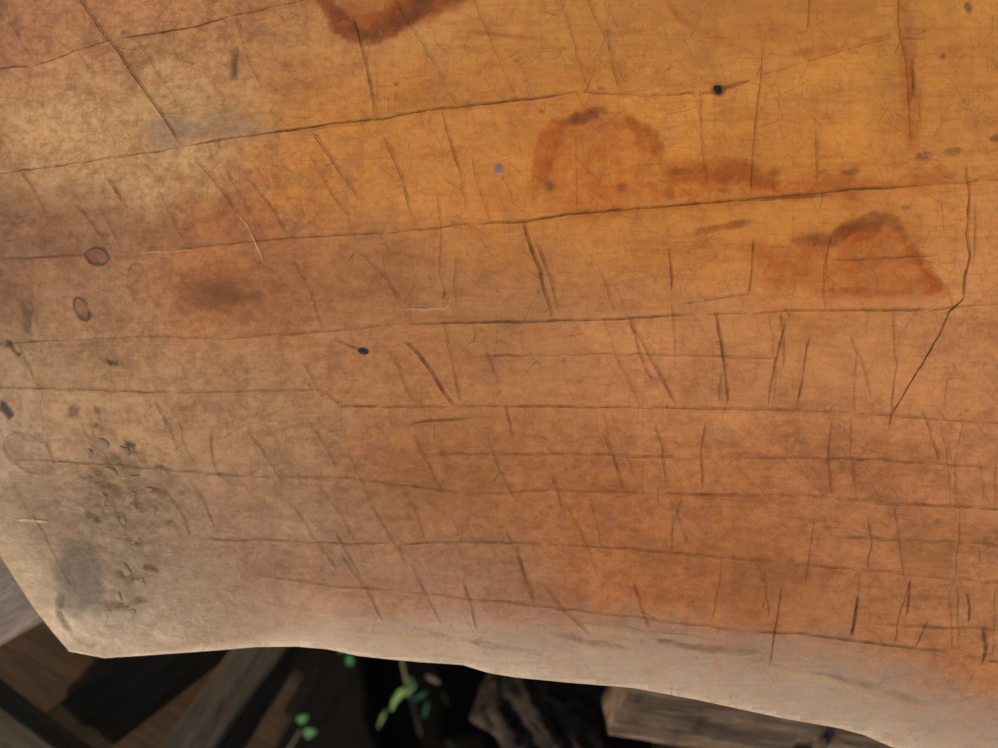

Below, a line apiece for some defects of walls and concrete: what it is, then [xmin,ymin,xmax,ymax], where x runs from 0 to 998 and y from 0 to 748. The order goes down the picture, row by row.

leakage [315,0,457,44]
crack [0,2,912,568]
crack [841,181,977,425]
crack [298,508,447,619]
crack [743,505,998,663]